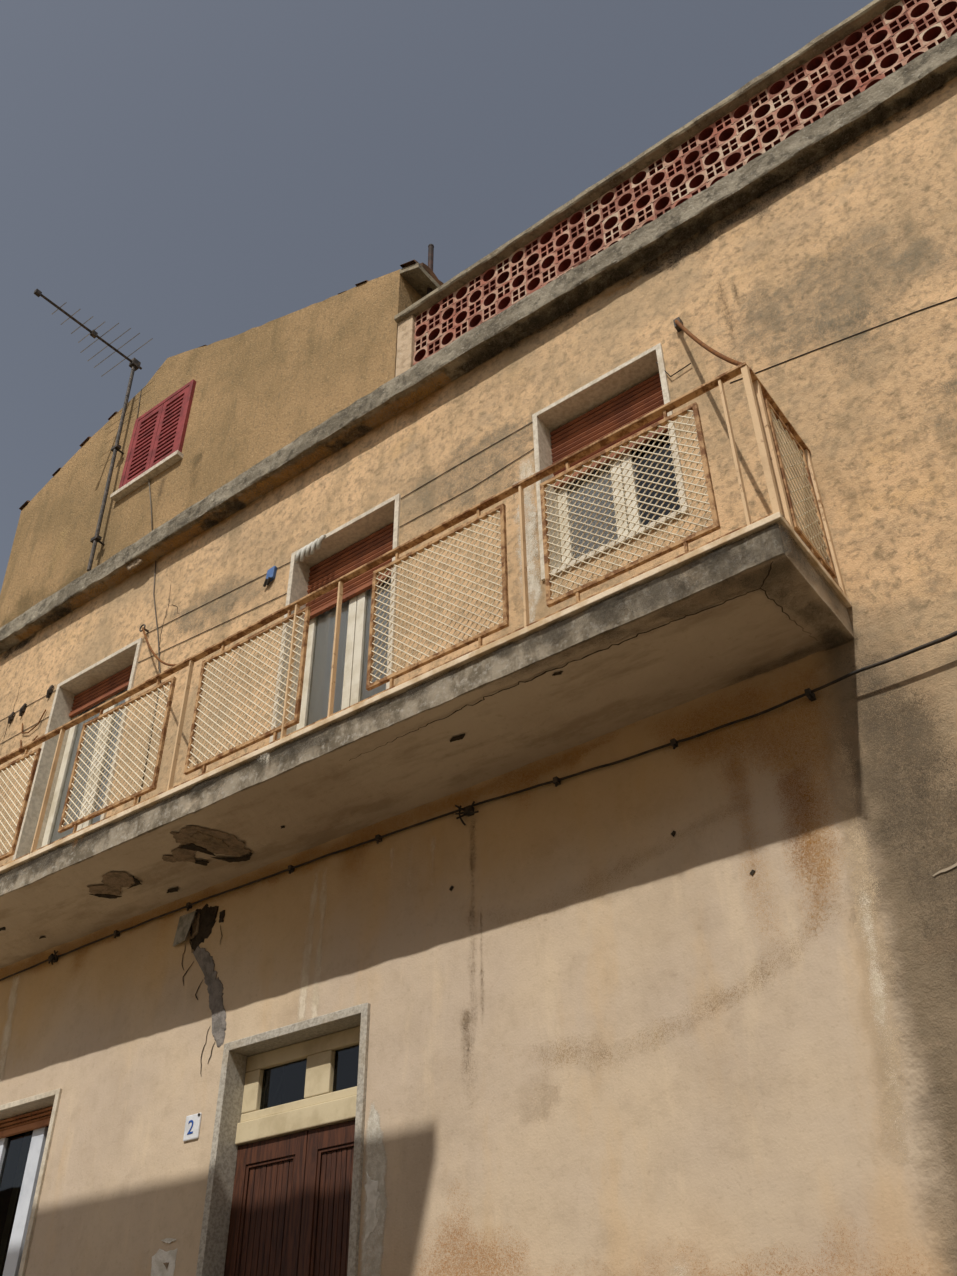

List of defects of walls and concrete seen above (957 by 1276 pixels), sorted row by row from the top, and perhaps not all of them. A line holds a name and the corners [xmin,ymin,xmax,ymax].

spalling [162,826,253,866]
damp [0,511,957,1170]
spalling [87,871,142,899]
spalling [173,904,225,970]
damp [415,1179,952,1276]